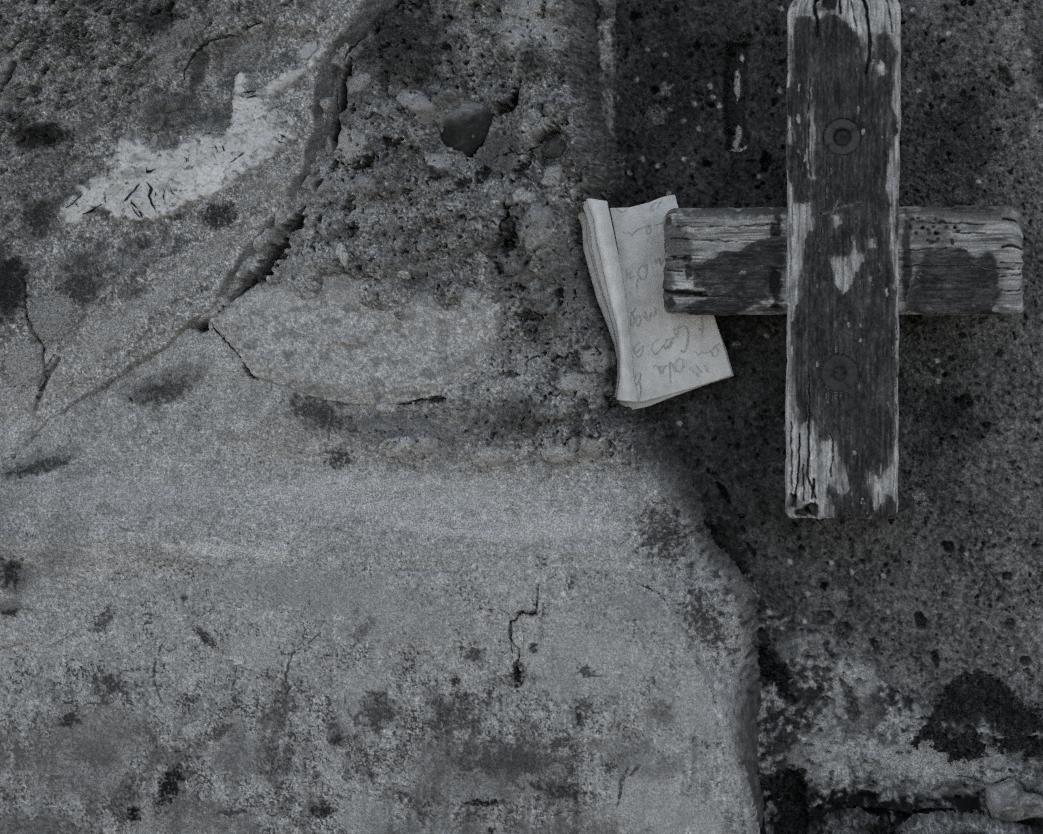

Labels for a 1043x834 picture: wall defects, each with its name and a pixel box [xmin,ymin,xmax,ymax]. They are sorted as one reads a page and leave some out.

crack [183,21,263,79]
crack [343,39,363,61]
crack [212,326,249,369]
crack [488,575,556,661]